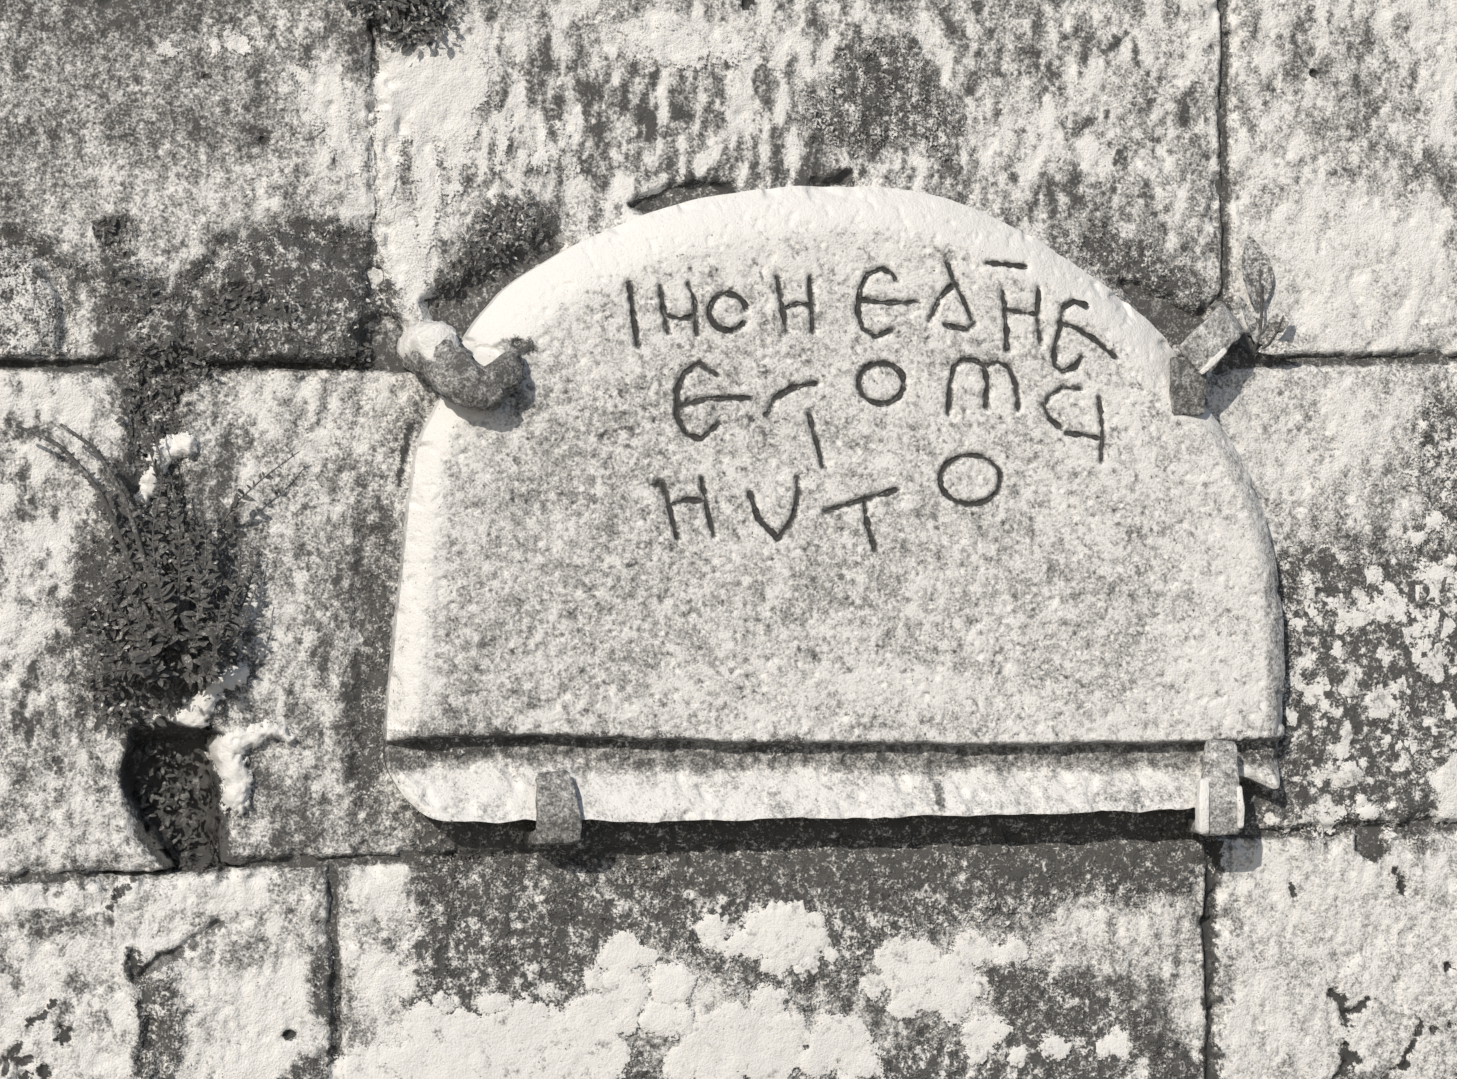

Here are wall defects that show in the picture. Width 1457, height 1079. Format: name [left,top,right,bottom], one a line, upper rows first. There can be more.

water stain [792,20,975,187]
water stain [627,167,736,212]
water stain [1054,214,1235,329]
water stain [345,371,1457,1079]